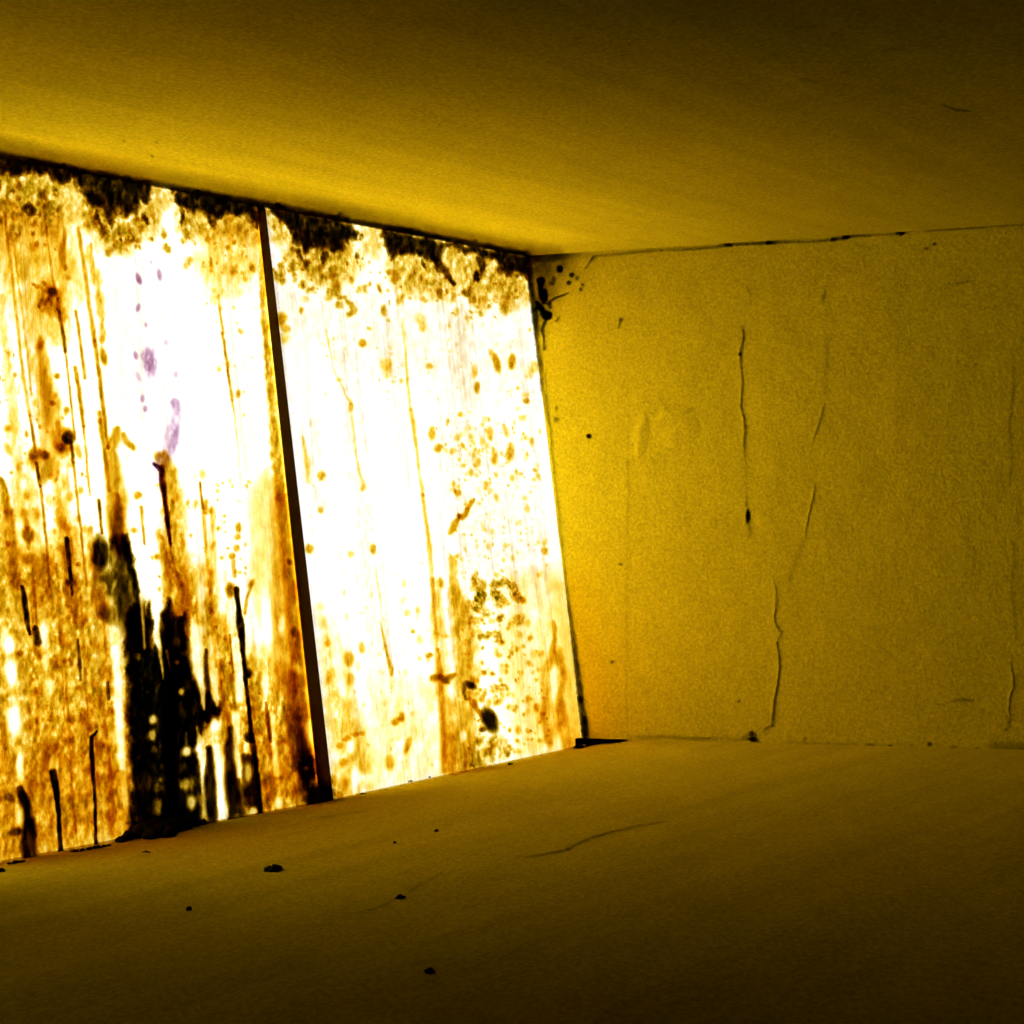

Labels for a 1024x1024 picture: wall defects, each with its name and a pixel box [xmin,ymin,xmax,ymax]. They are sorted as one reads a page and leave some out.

crack [736,328,747,456]
rust [409,400,419,469]
rust [155,451,190,615]
damp [0,151,584,845]
rust [420,482,432,560]
rust [448,498,475,535]
crack [803,483,816,535]
rust [381,627,394,676]
crack [769,583,781,725]